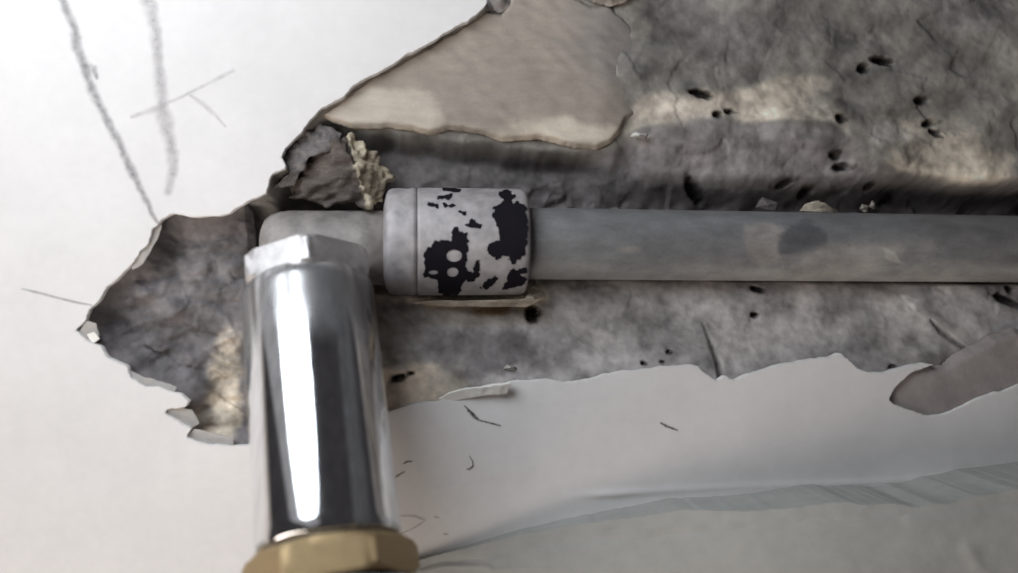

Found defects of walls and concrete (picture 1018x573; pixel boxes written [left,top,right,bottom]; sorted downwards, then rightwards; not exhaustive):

crack [82,59,134,176]
flaking render [80,0,1018,445]